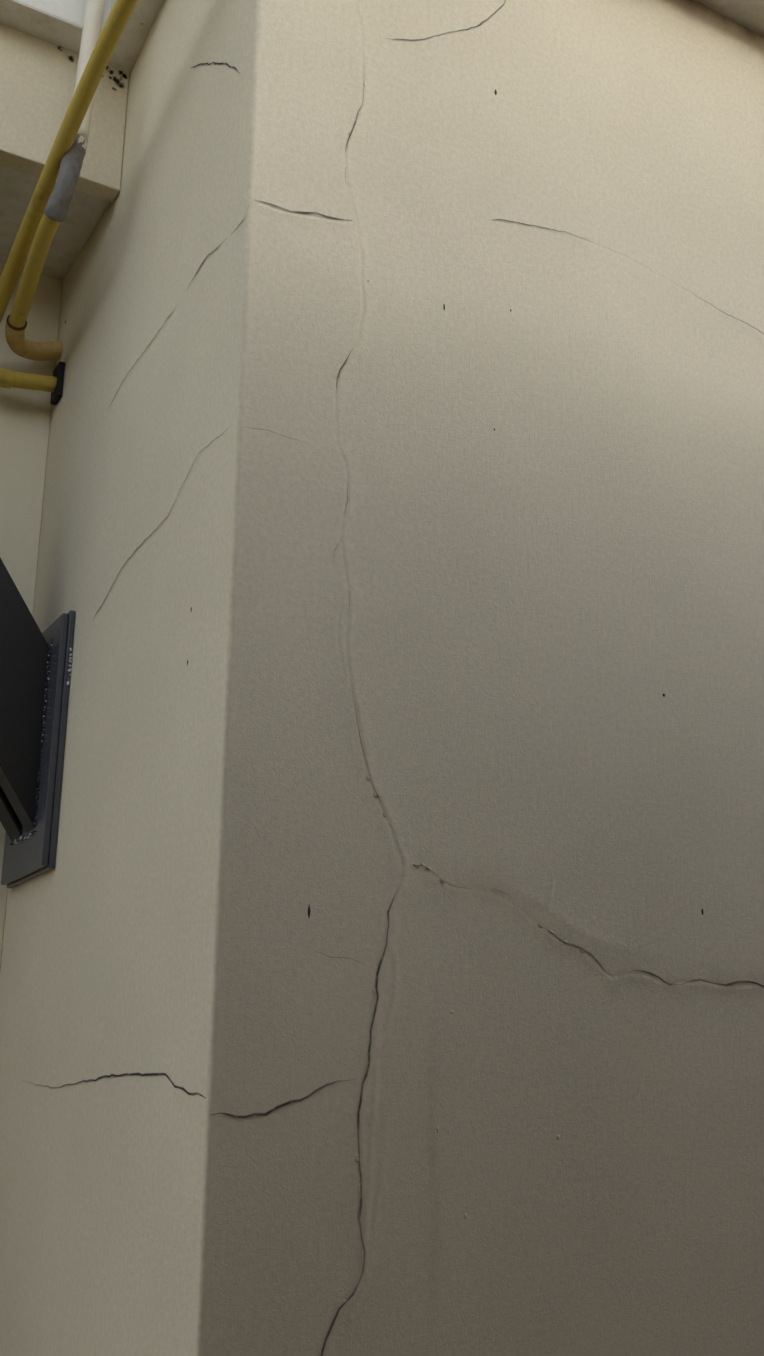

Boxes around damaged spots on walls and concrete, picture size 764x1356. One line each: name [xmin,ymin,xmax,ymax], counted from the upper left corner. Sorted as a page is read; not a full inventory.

crack [189,176,360,285]
crack [48,1073,339,1118]